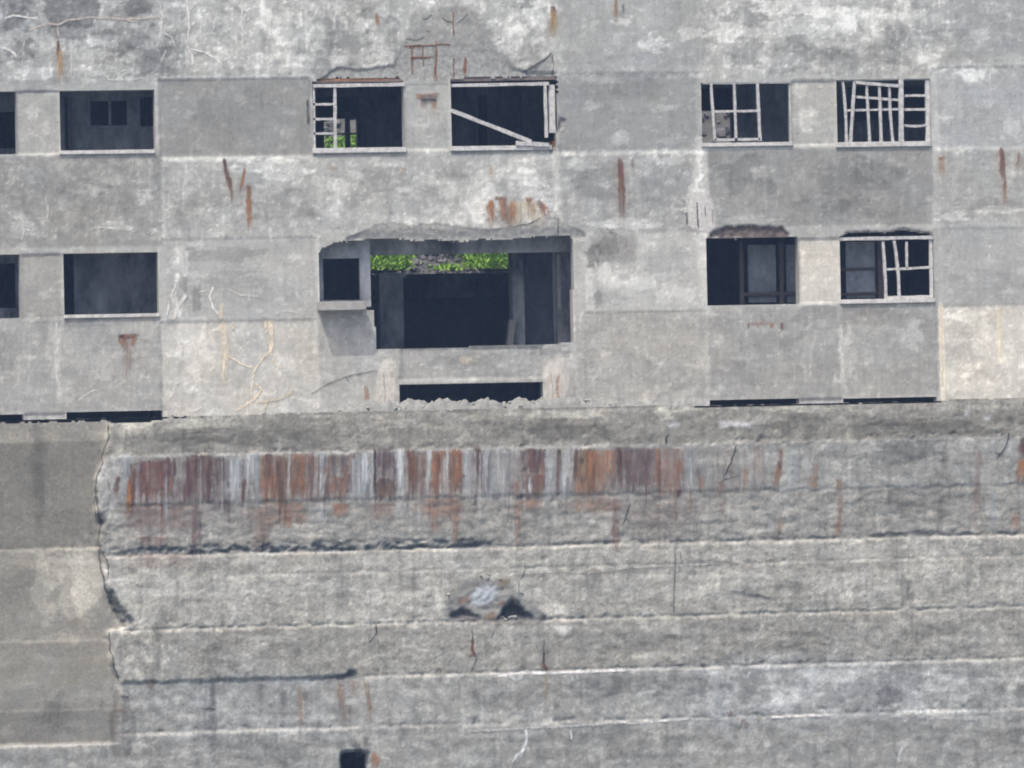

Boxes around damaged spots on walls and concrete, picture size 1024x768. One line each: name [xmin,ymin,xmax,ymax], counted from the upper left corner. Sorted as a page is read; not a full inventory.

crack [0,0,222,72]
spalling [322,0,555,84]
rust [223,159,251,225]
spalling [346,184,588,243]
rust [487,196,546,222]
peeling [681,192,790,240]
crack [94,425,111,594]
rust [363,447,504,534]
rust [525,447,657,504]
spalling [445,574,572,634]